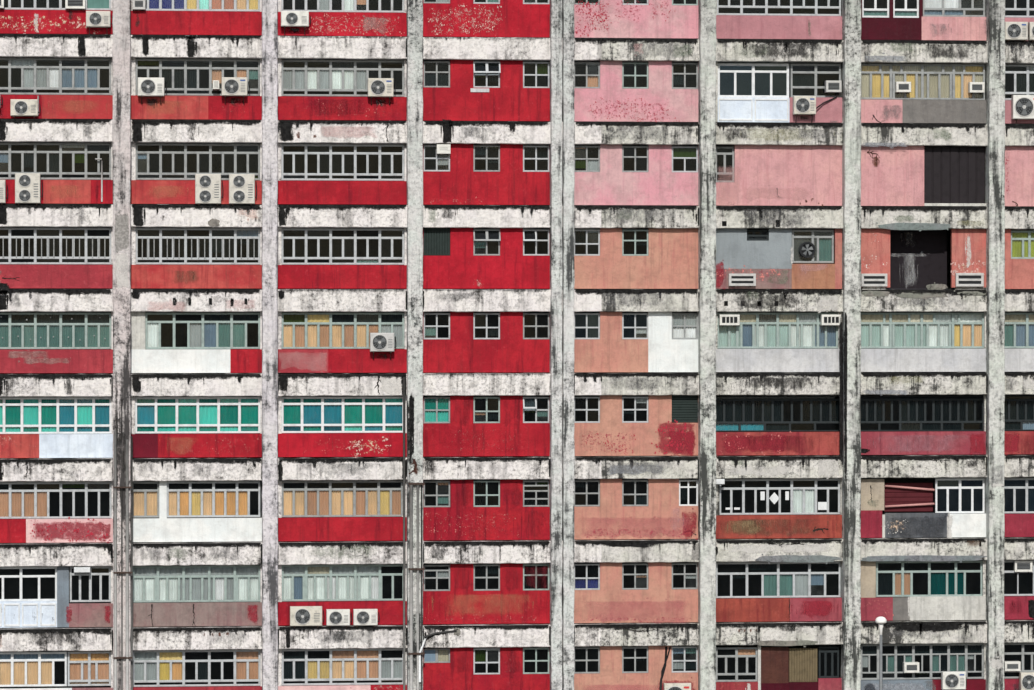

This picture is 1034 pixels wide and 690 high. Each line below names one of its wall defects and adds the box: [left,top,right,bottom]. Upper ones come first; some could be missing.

peeling [0,14,98,34]
peeling [308,11,405,37]
peeling [428,3,502,35]
peeling [575,0,671,36]
leakage [862,27,987,58]
leakage [0,119,111,141]
leakage [861,373,988,394]
peeling [322,437,391,458]
leakage [861,449,988,475]
peeling [31,517,111,543]
leakage [1004,600,1034,638]